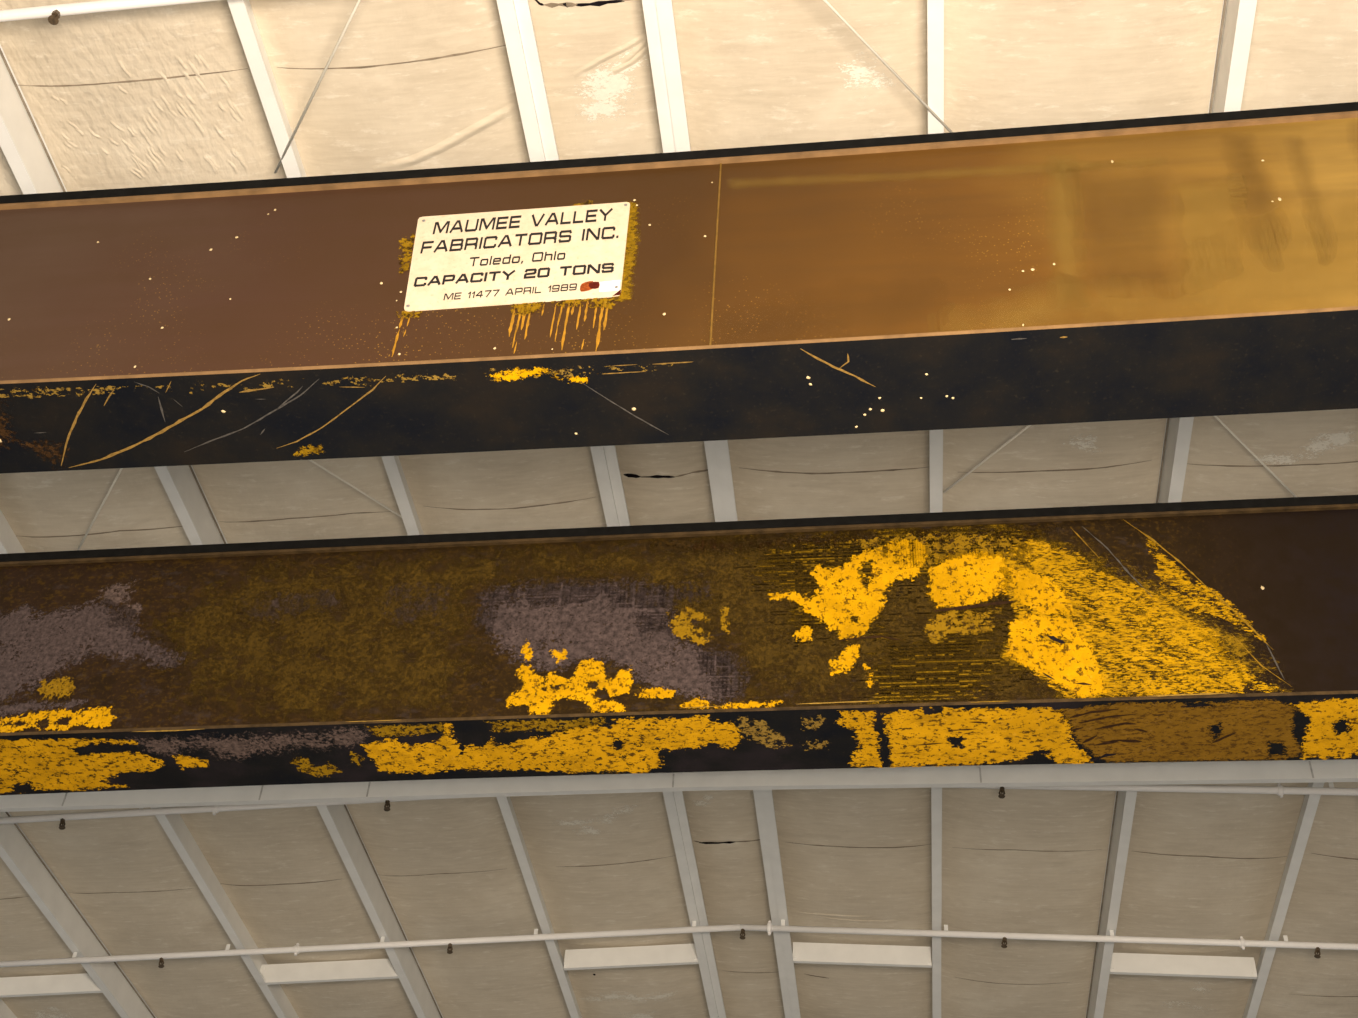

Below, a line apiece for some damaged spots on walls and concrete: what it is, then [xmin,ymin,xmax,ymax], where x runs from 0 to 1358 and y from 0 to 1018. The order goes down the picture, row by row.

leakage [574,47,648,122]
peeling [0,523,1358,794]